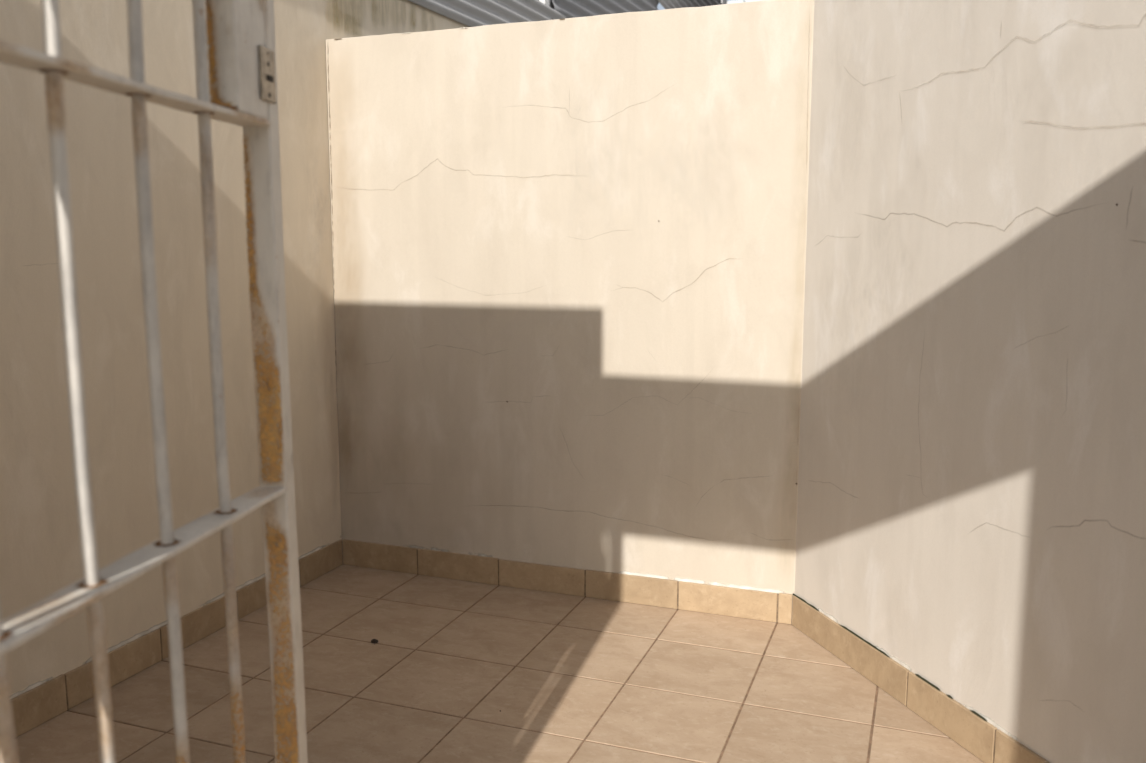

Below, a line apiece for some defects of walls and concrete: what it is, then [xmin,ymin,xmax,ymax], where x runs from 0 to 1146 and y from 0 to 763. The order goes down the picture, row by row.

corrosion [244,140,283,483]
corrosion [266,523,299,763]